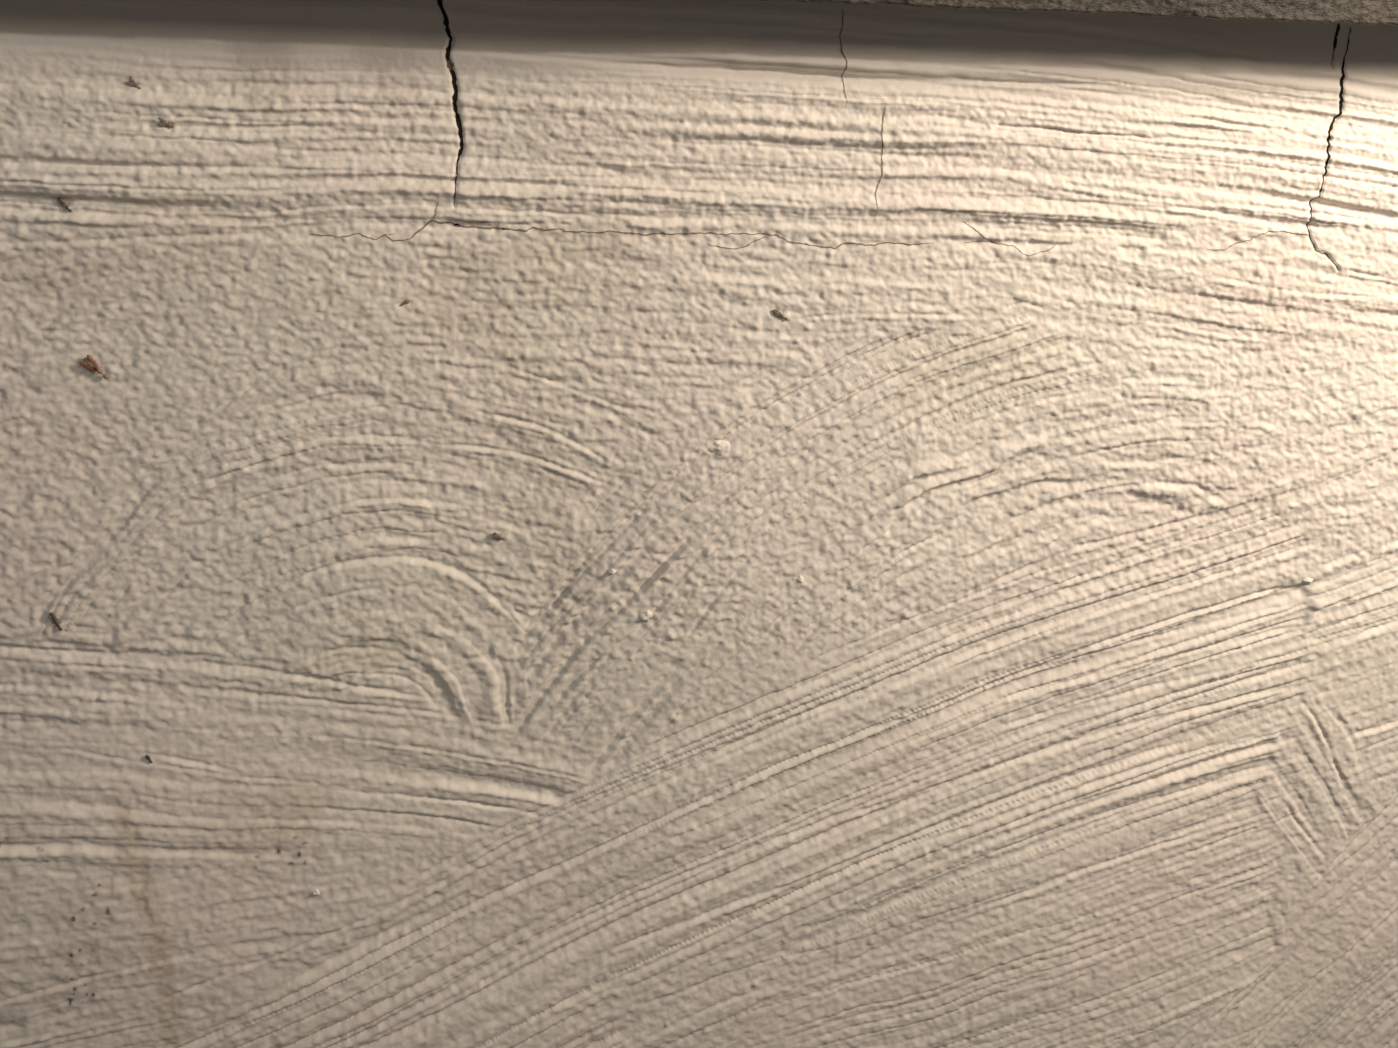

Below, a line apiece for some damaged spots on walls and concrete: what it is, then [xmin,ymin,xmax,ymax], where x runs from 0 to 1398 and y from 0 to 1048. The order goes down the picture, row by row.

crack [312,0,1053,256]
crack [1208,23,1351,269]